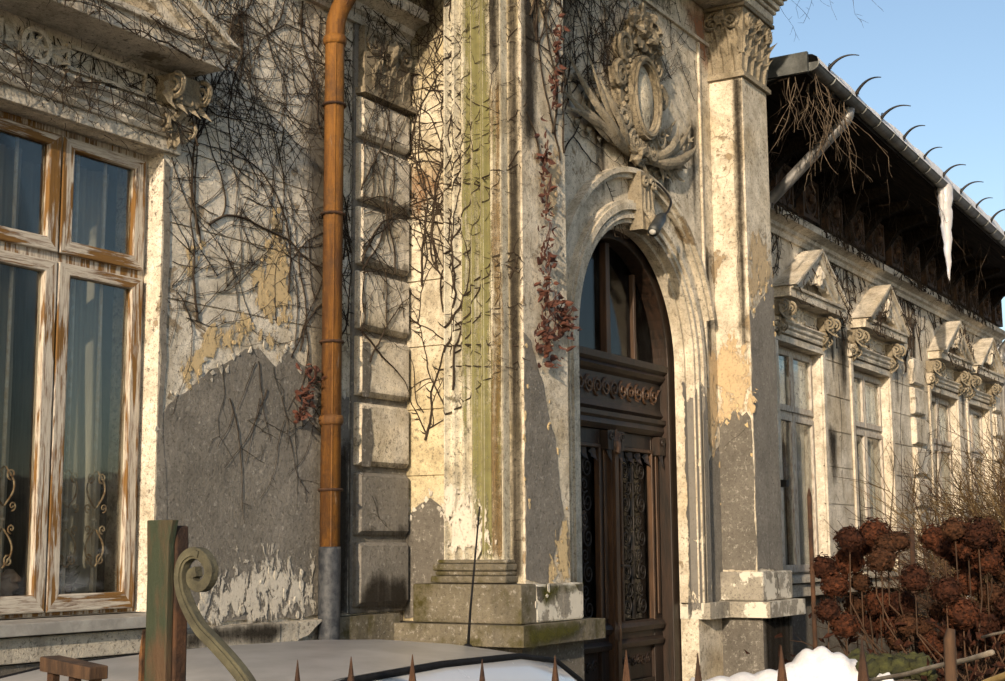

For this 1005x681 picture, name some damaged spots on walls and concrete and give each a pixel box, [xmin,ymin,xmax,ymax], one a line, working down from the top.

spalling [154,159,321,626]
spalling [681,229,783,615]